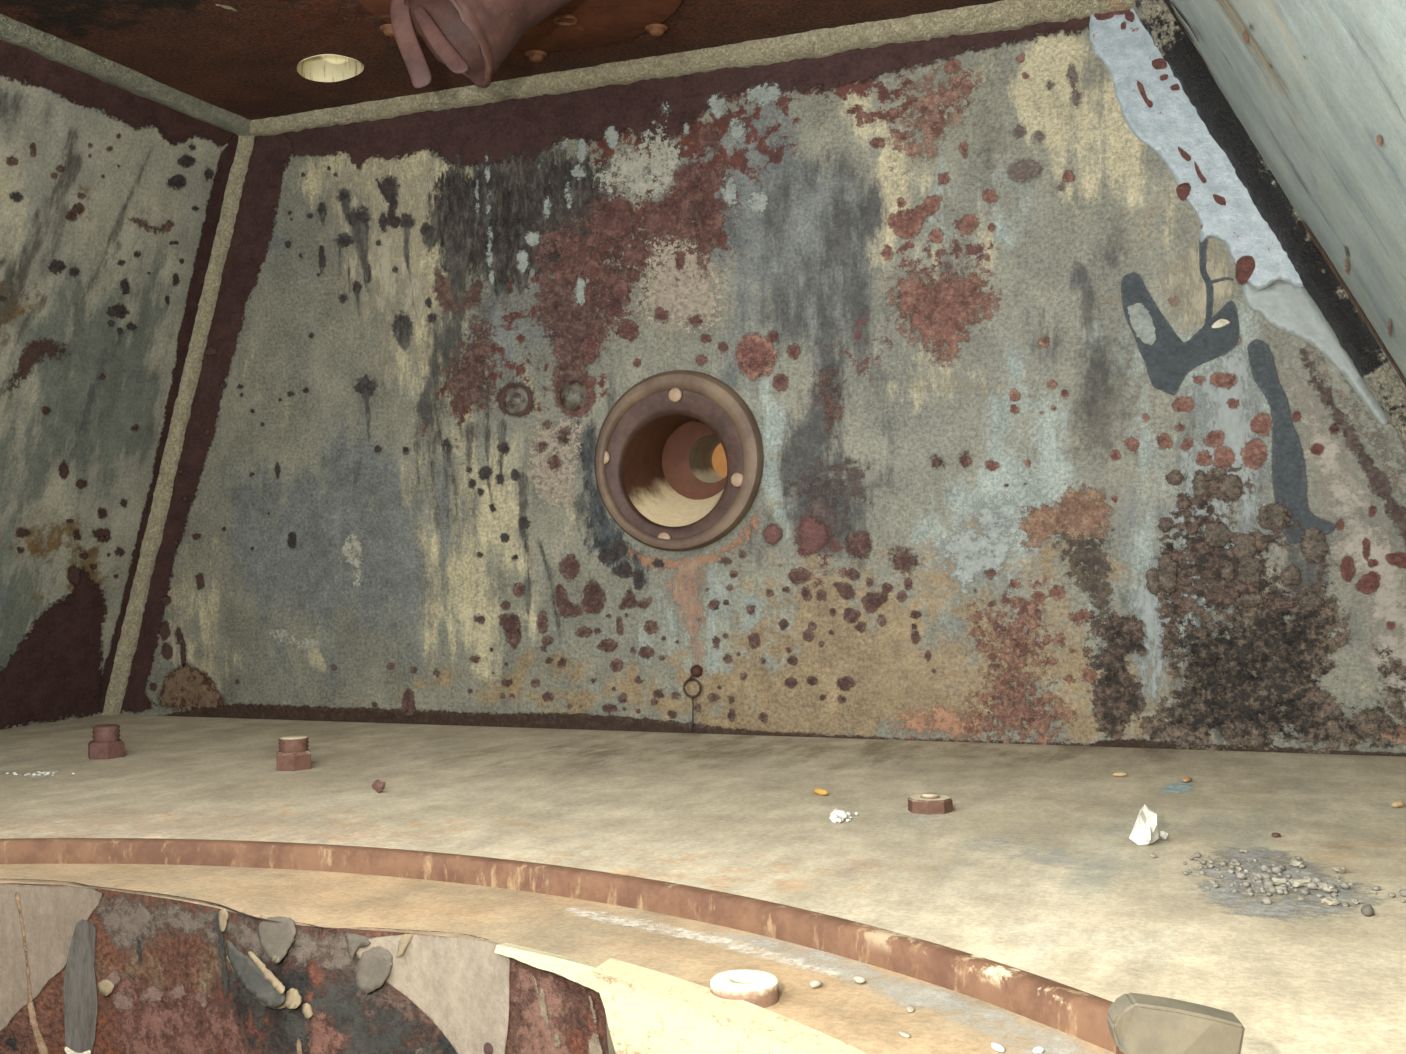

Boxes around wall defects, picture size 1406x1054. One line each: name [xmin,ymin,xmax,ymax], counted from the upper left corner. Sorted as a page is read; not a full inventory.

corrosion [0,17,1090,730]
peeling [1089,8,1406,710]
corrosion [1307,343,1406,495]
corrosion [887,372,1406,754]
corrosion [103,976,255,1054]
corrosion [305,1009,351,1054]
corrosion [484,962,573,1054]